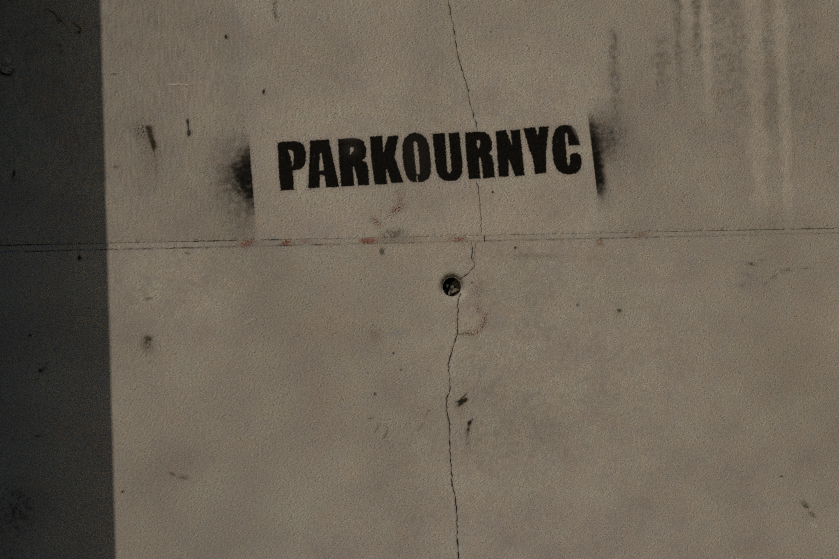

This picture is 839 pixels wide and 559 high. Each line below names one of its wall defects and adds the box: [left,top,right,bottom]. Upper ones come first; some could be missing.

crack [447,0,478,131]
crack [417,180,487,559]